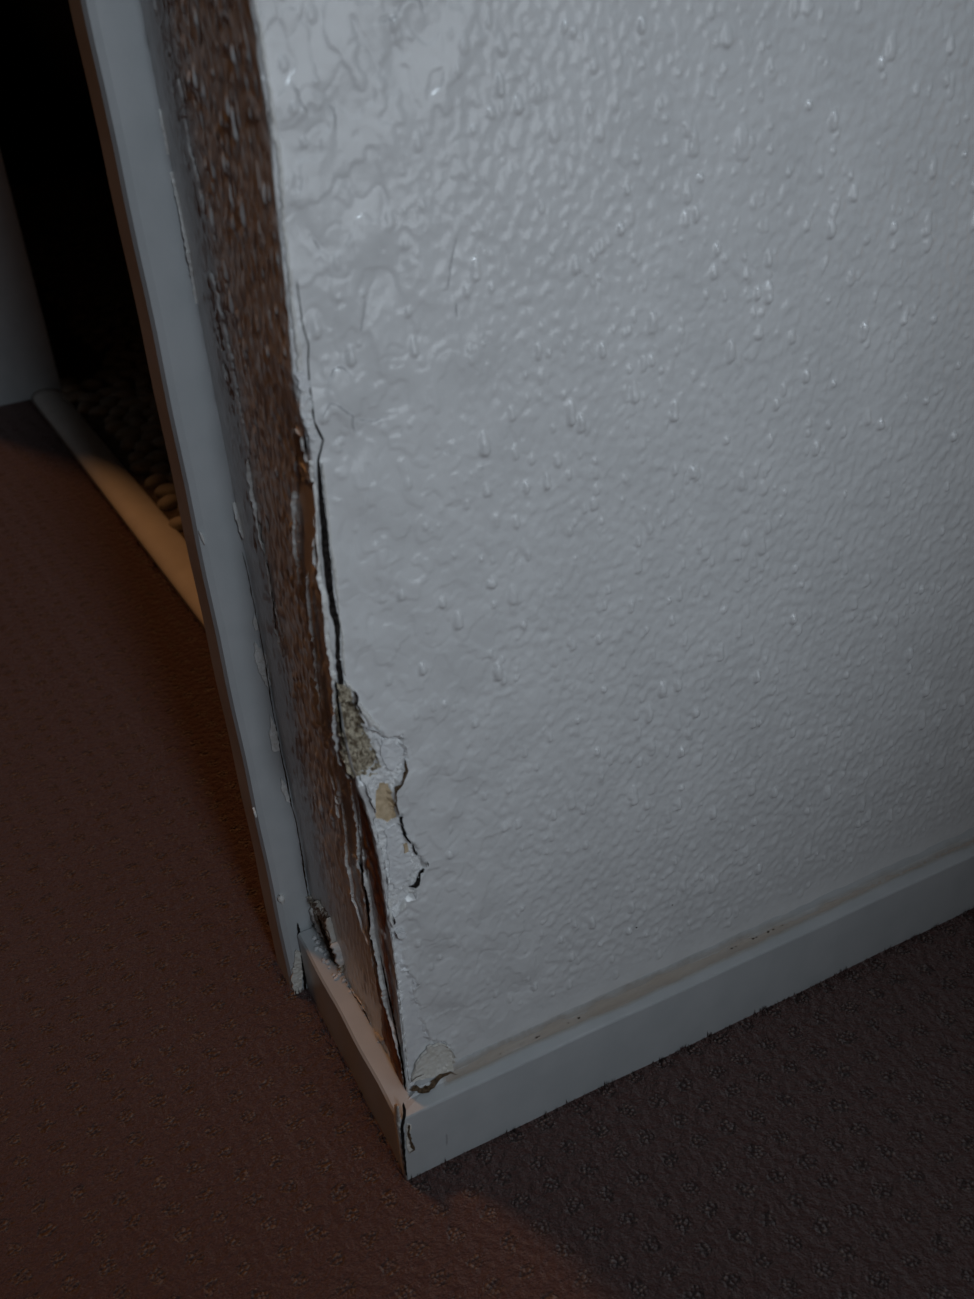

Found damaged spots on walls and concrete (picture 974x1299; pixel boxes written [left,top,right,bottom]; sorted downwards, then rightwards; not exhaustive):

flaking render [252,0,456,1089]
crack [297,283,457,1176]